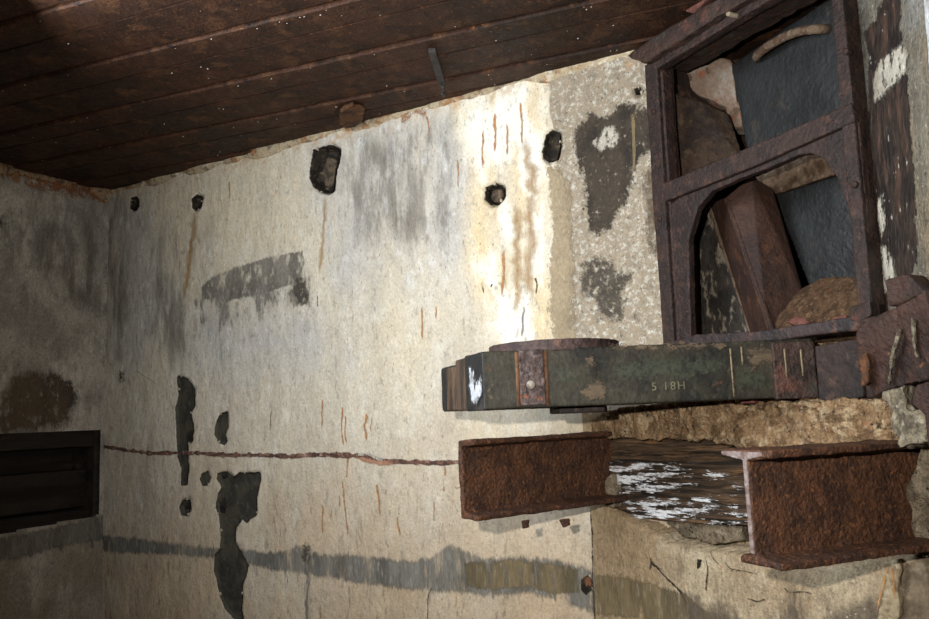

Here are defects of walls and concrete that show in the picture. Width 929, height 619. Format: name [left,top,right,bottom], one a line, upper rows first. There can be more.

leakage [873,46,909,102]
hole [309,145,341,193]
rust [481,115,508,164]
leakage [573,101,657,254]
rust [185,219,195,290]
rust [501,152,535,297]
efflorescence [880,245,894,292]
spalling [175,374,196,486]
crack [103,445,458,466]
spalling [179,497,192,516]
spalling [200,470,261,619]
leakage [240,546,736,619]